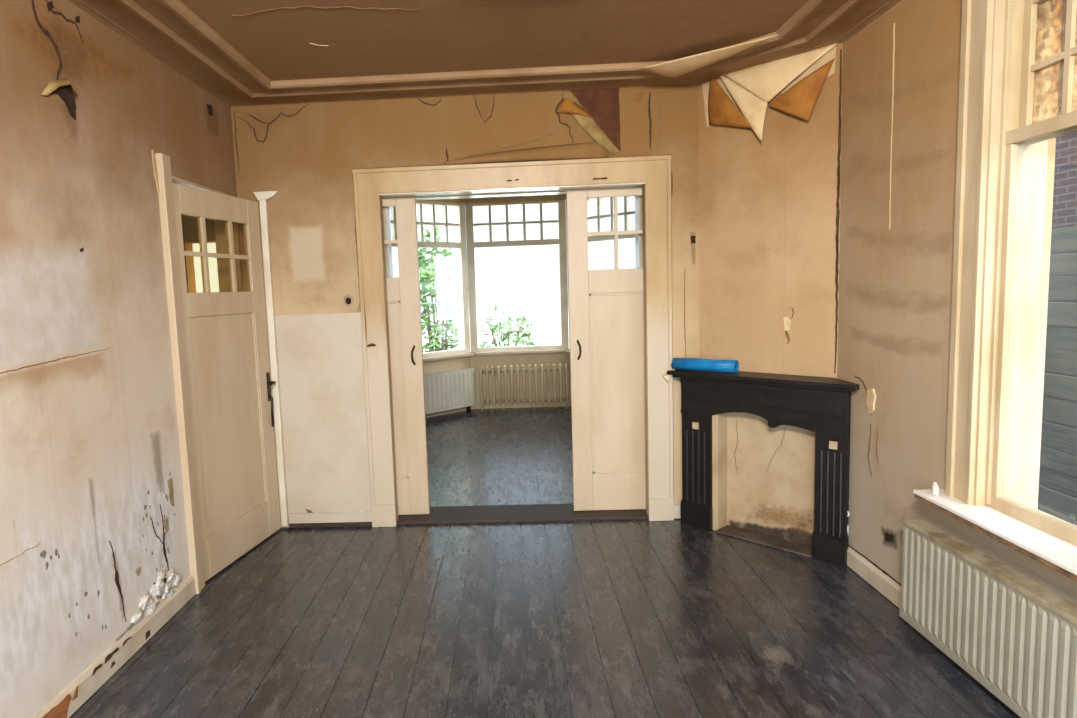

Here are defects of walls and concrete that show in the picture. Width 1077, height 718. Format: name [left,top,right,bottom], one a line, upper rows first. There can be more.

flaking render [780,46,837,93]
flaking render [702,77,747,127]